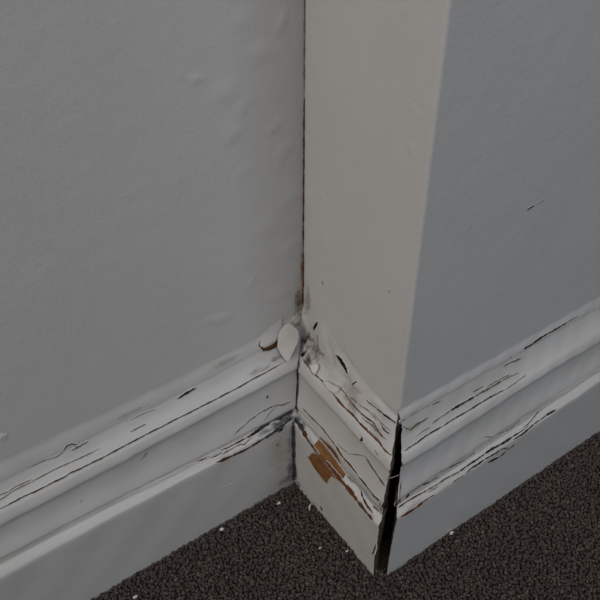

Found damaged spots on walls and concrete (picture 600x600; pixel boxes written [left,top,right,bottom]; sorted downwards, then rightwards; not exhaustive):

flaking render [257,305,349,392]
crack [0,315,578,521]
peeling [307,437,347,484]